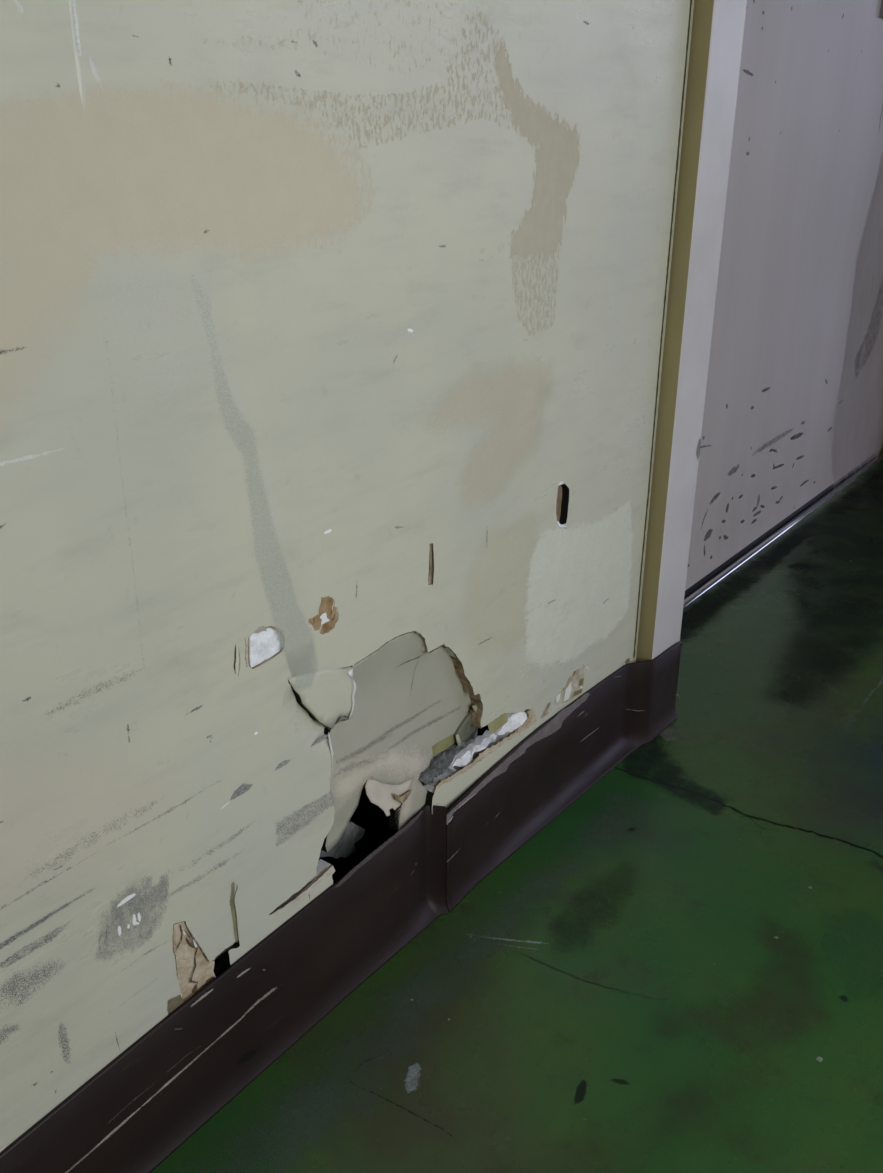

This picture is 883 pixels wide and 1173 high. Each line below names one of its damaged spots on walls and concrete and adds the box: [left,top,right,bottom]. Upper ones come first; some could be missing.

peeling [308,596,339,634]
flaking render [234,626,285,676]
spalling [540,664,589,718]
spalling [350,781,380,824]
crack [616,736,883,892]